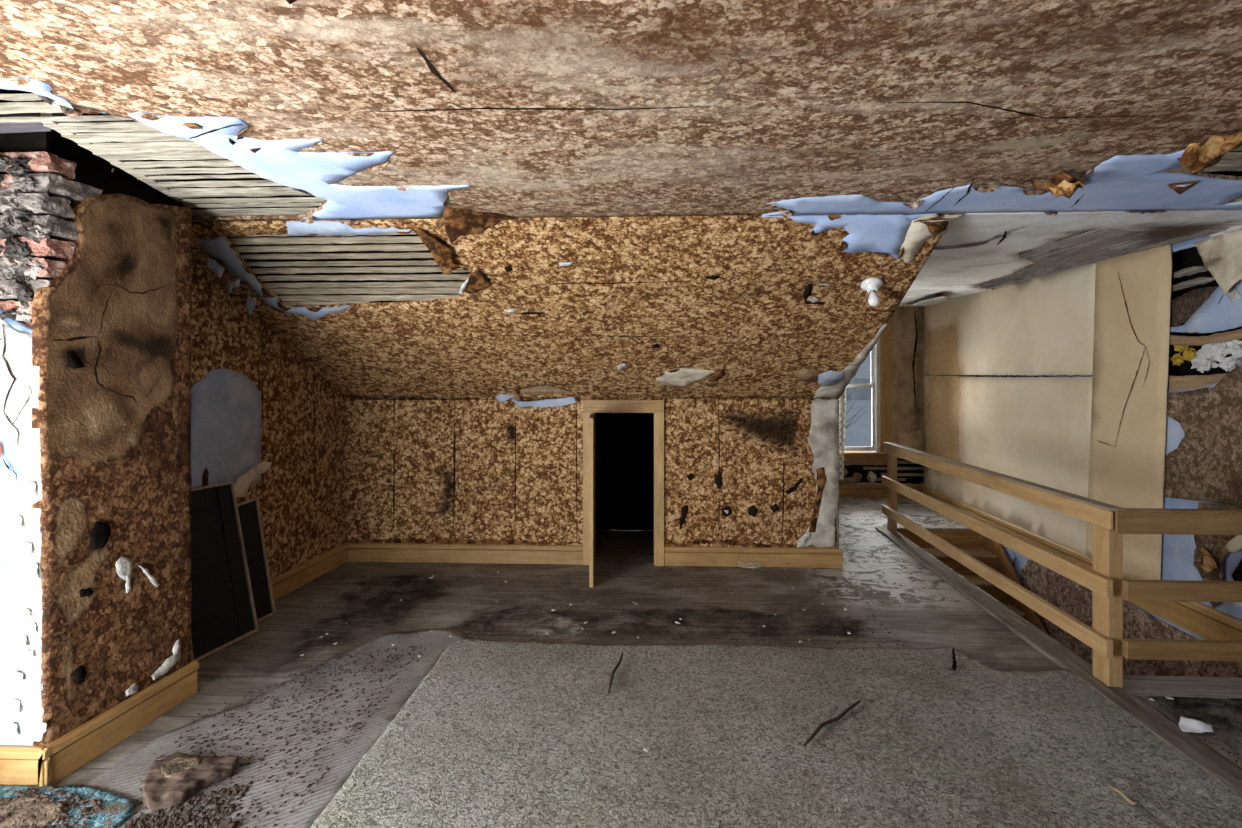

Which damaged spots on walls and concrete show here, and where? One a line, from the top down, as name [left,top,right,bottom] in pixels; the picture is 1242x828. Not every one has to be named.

peeling [0,78,471,321]
peeling [762,150,1242,263]
flaking render [0,151,273,743]
leakage [116,331,172,361]
peeling [793,324,924,548]
crack [1097,273,1150,447]
spalling [1118,233,1242,391]
hole [1231,559,1242,581]